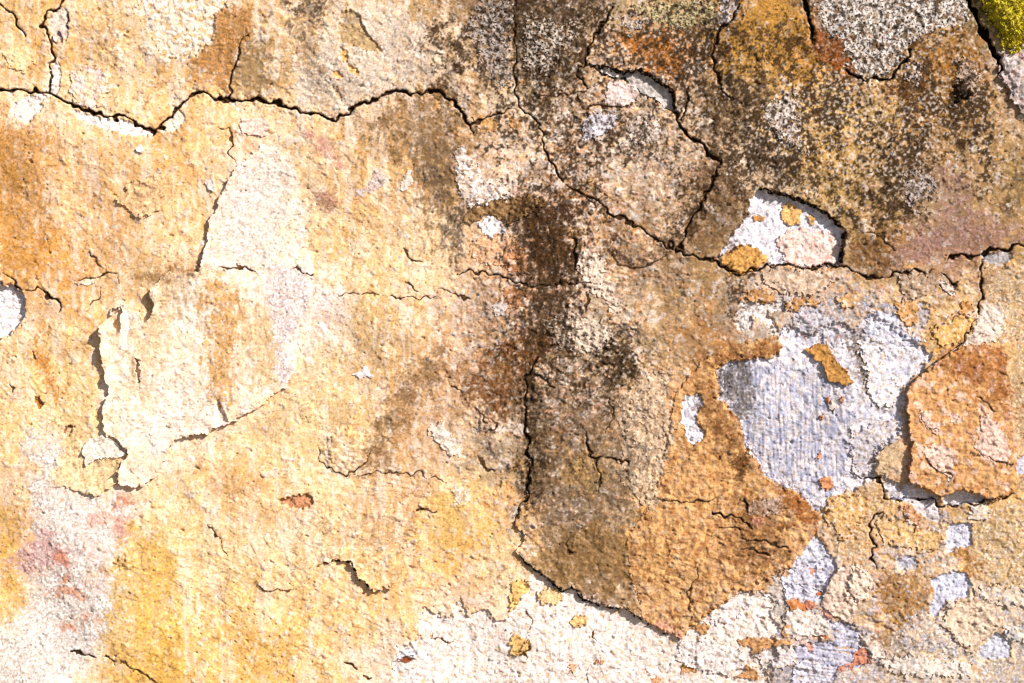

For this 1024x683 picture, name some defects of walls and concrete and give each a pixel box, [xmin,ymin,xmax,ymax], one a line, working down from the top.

spalling [0,281,26,340]
peeling [48,116,317,496]
leakage [362,190,660,571]
crack [0,0,1024,352]
crack [514,357,554,524]
peeling [392,297,1024,683]
spalling [717,188,847,275]